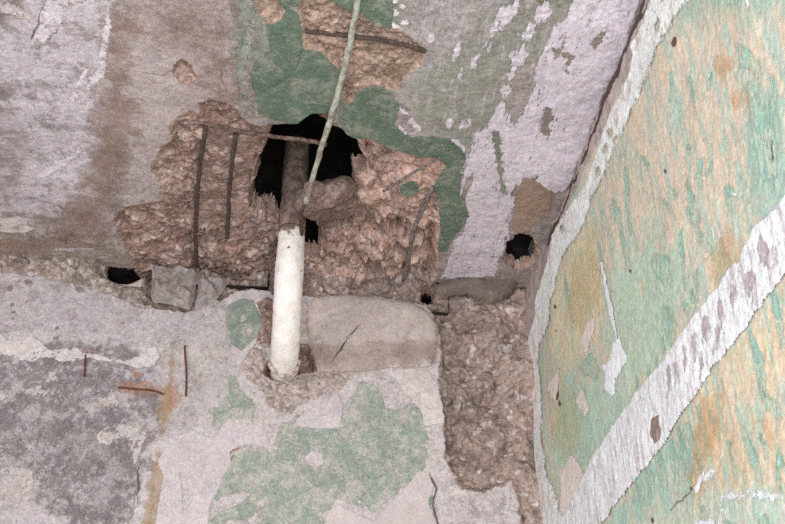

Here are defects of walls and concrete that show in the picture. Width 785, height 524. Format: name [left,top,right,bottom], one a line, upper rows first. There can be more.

peeling [734,43,777,191]
spalling [0,0,354,414]
peeling [636,144,732,269]
flaking render [756,235,780,270]
flaking render [636,268,758,395]
peeling [749,326,785,421]
peeling [772,291,785,348]
flaking render [0,415,149,524]
peeling [210,375,429,524]
peeling [694,413,783,524]